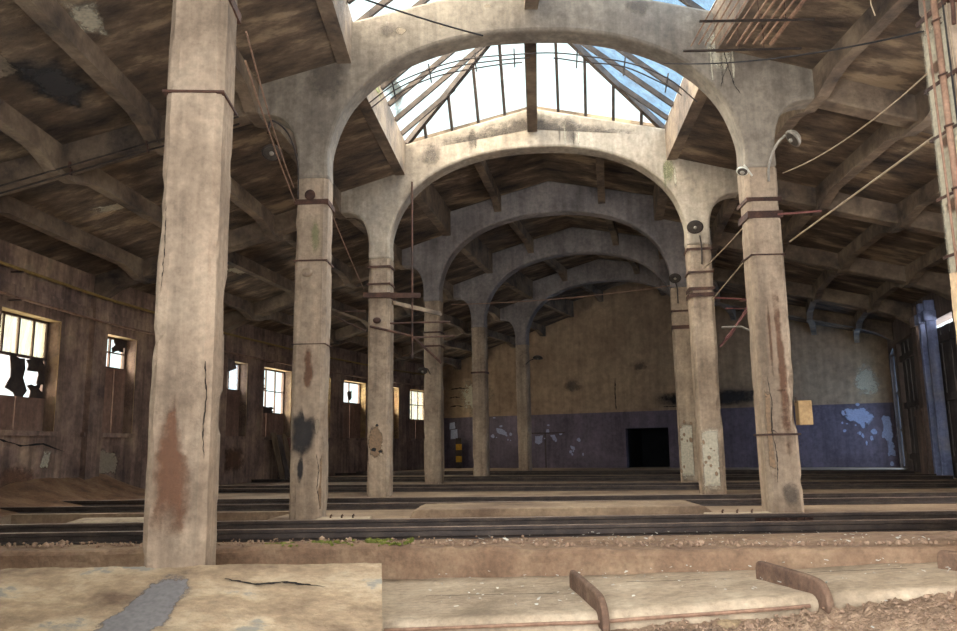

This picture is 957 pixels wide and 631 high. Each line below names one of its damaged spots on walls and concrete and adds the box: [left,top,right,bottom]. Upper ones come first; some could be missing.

peeling [841,403,896,466]
peeling [94,574,189,631]
crack [225,578,325,587]